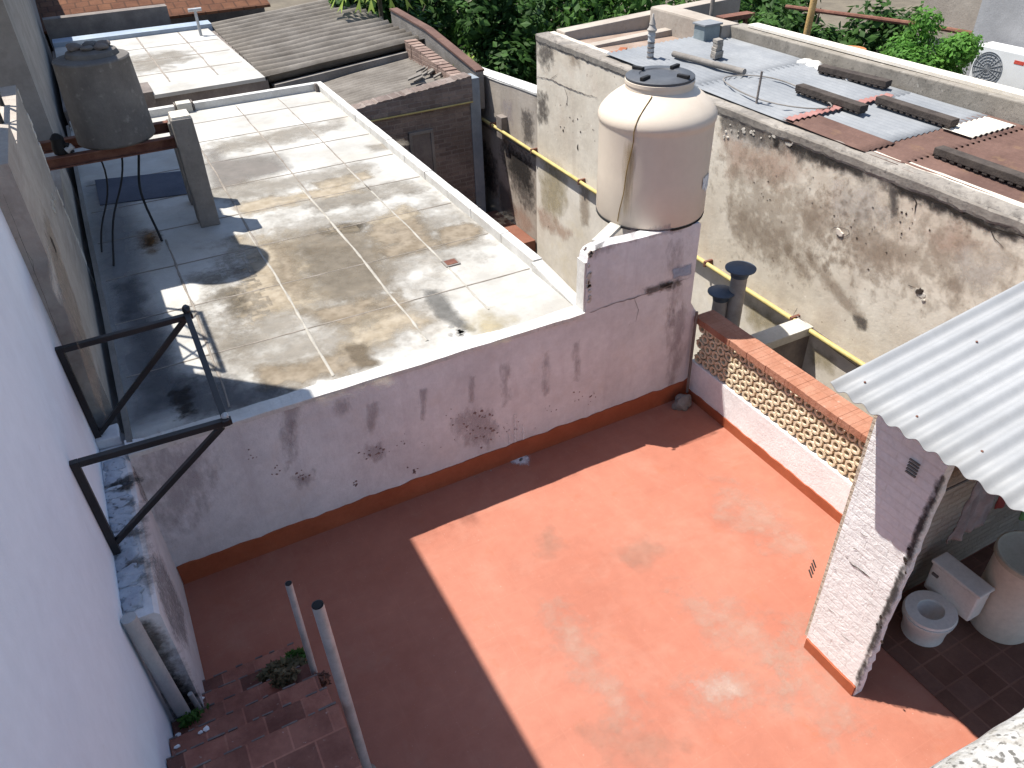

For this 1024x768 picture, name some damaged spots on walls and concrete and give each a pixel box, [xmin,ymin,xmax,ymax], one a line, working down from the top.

leakage [539,41,556,63]
leakage [522,93,547,144]
leakage [720,117,1021,240]
leakage [91,127,482,423]
spalling [583,246,595,303]
crack [590,279,684,319]
leakage [740,215,866,330]
leakage [107,469,146,508]
leakage [126,553,187,641]
leakage [142,623,198,711]